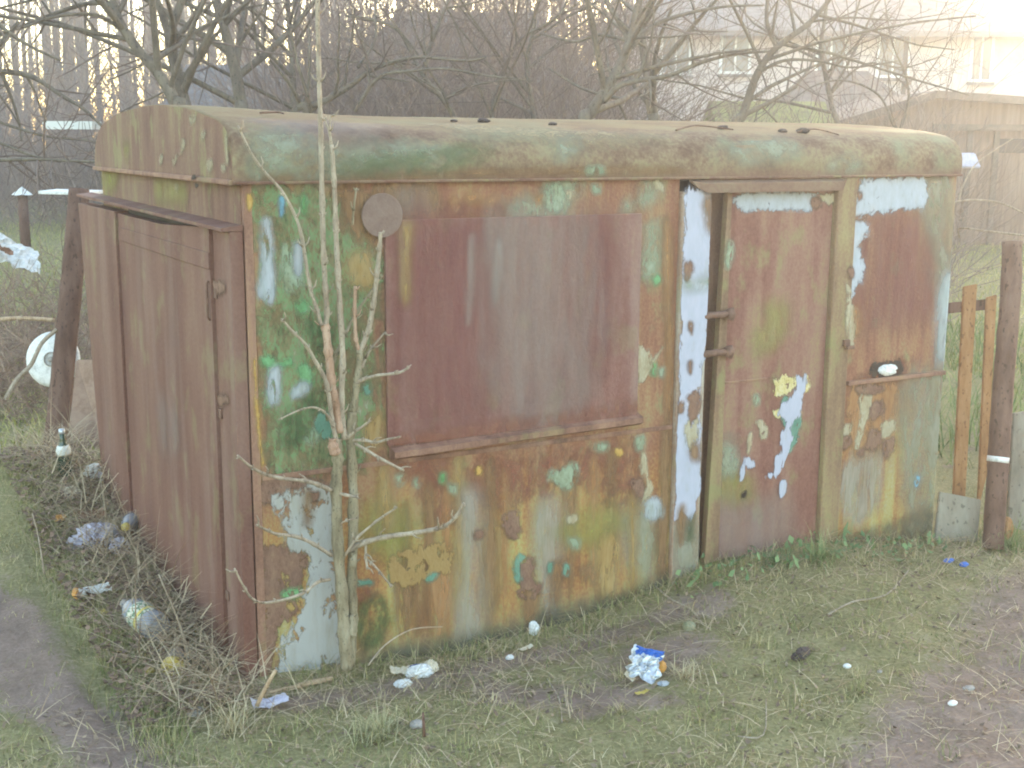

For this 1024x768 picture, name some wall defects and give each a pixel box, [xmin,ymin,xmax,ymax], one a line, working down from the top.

peeling [820,193,834,205]
peeling [739,373,811,498]
corrosion [843,358,908,494]
corrosion [501,509,523,541]
peeling [271,484,340,673]
corrosion [516,557,570,619]
corrosion [597,529,620,601]